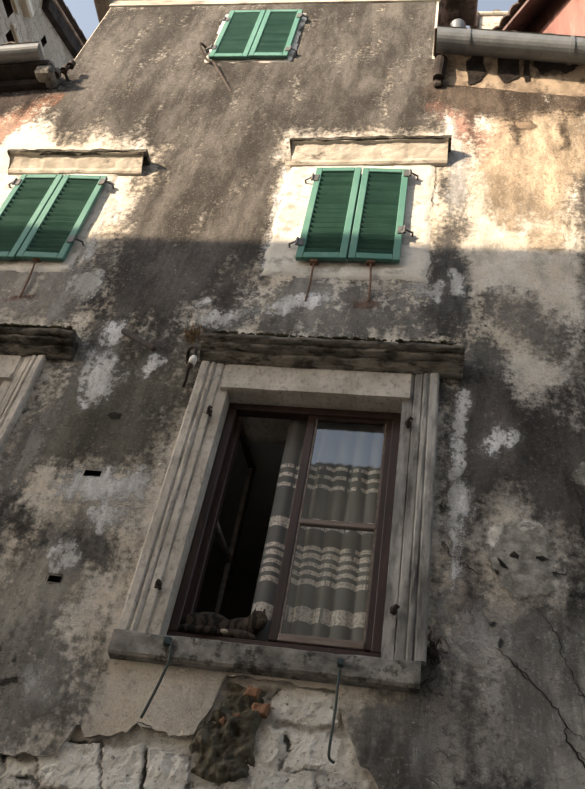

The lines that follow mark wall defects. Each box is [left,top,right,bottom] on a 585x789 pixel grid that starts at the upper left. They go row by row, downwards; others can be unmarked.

peeling [466,56,486,85]
peeling [497,58,578,83]
corrosion [0,92,64,144]
leakage [466,107,477,136]
leakage [470,108,585,249]
leakage [262,276,310,303]
leakage [265,292,330,316]
leakage [477,286,576,363]
flaking render [485,519,555,600]
crack [532,605,585,697]
flaking render [188,683,271,785]
crack [491,644,585,768]